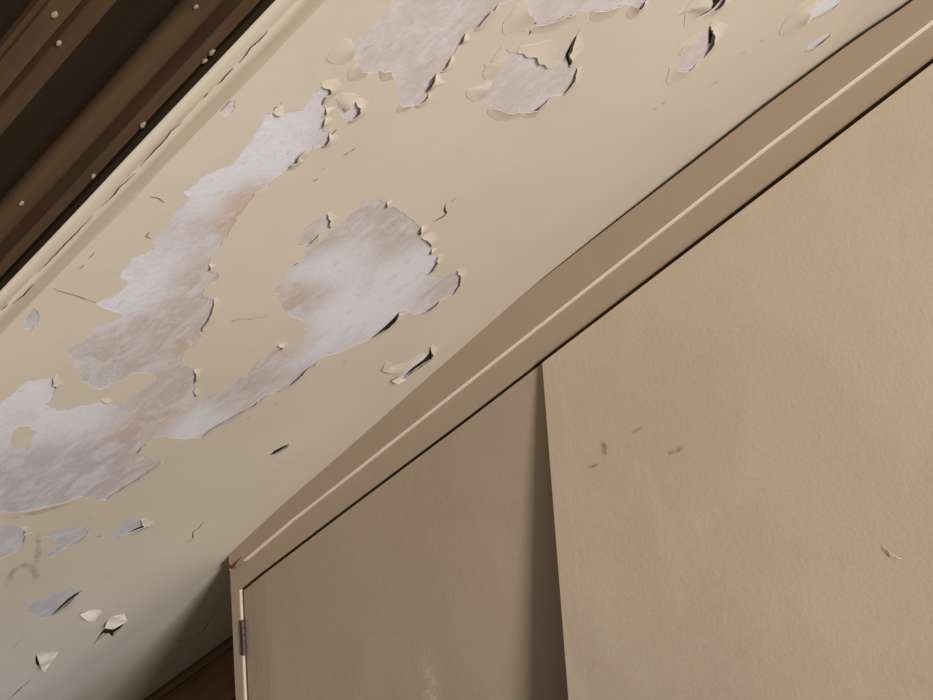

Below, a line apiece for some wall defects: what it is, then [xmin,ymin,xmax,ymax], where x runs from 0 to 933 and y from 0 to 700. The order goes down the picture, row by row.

peeling [779,0,842,36]
peeling [666,0,731,84]
peeling [0,0,649,513]
peeling [0,525,32,559]
peeling [112,518,154,540]
peeling [23,588,127,642]
peeling [35,651,59,672]